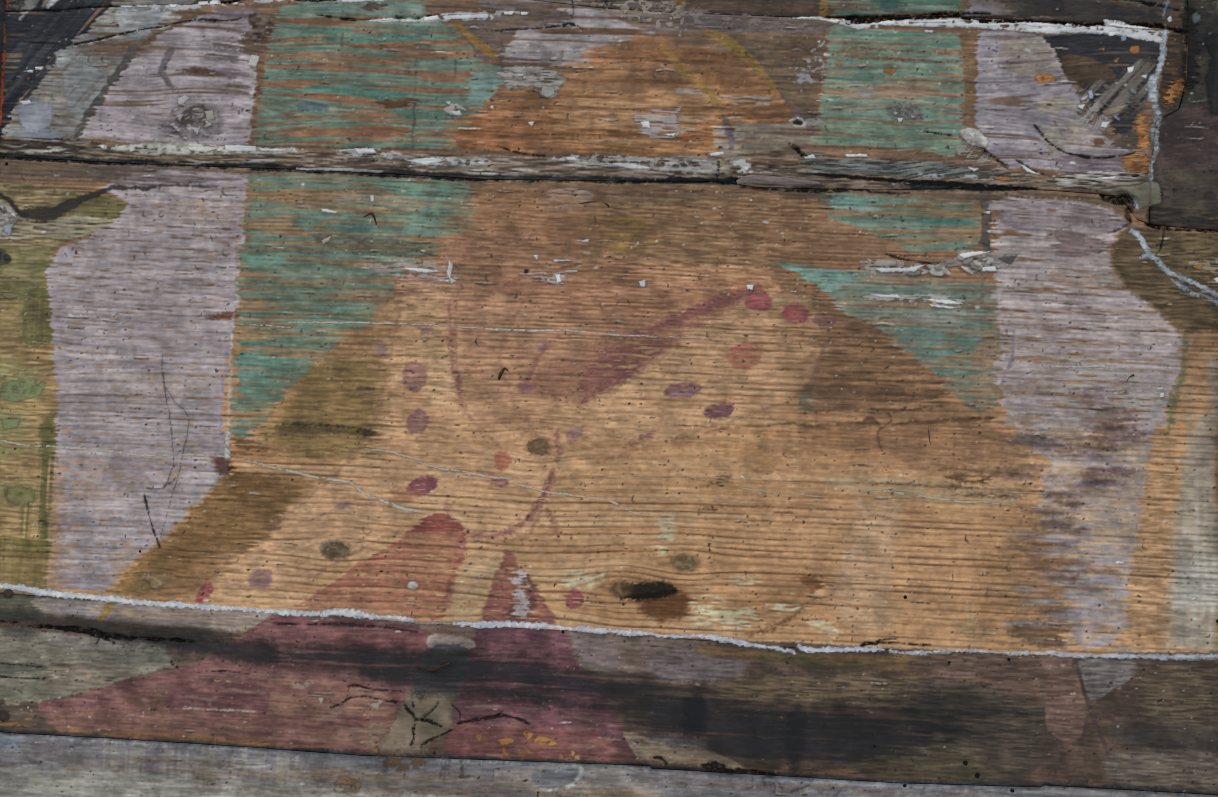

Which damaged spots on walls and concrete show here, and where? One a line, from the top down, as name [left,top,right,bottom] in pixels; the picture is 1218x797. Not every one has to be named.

peeling [444,101,466,116]
peeling [496,52,567,98]
peeling [552,0,1163,189]
spalling [1163,79,1187,104]
crack [2,157,168,167]
crack [197,166,323,174]
crack [360,125,1218,255]
peeling [859,235,1016,277]
peeling [864,294,971,309]
crack [330,684,530,745]